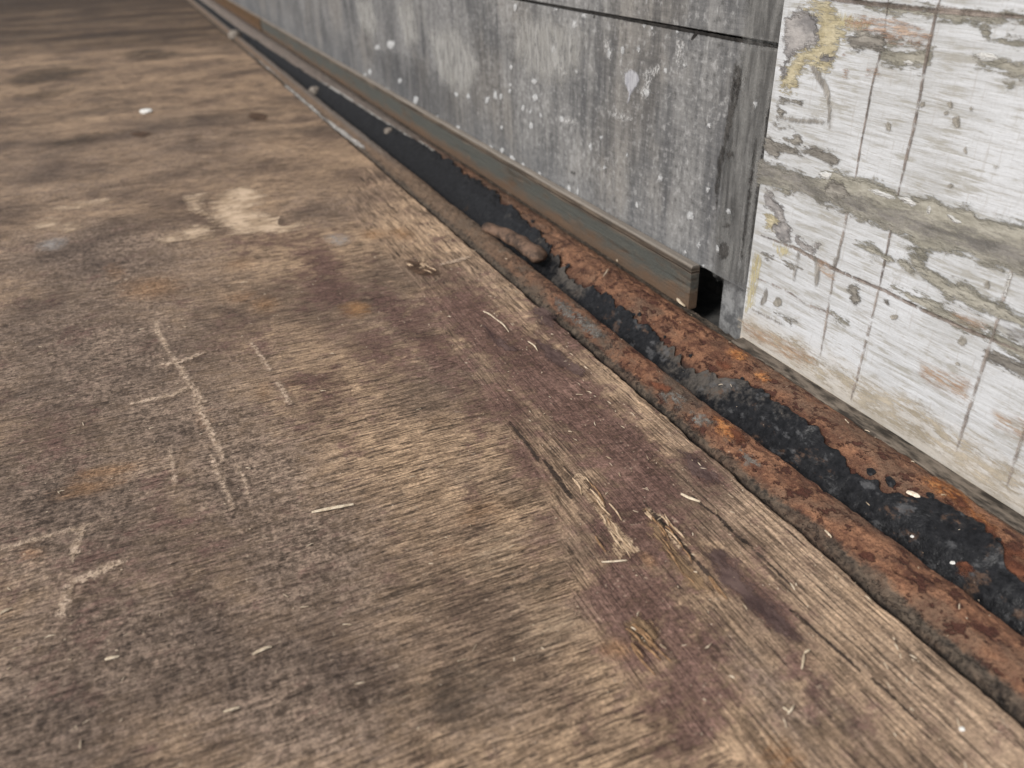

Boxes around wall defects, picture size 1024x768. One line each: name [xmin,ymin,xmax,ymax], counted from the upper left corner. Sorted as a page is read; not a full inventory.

peeling [194,0,1024,637]
corrosion [928,476,1024,577]